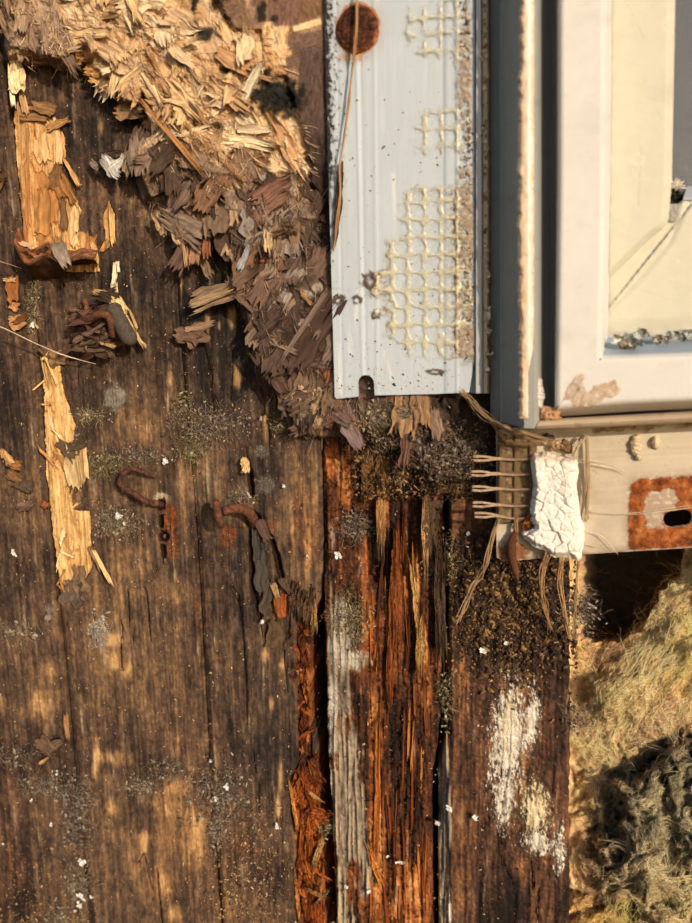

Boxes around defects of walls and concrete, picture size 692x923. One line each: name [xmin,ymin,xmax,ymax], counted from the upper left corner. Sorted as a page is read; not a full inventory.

rust [335,2,380,60]
spalling [0,0,501,923]
rust [628,476,692,550]
damp [329,681,338,748]
damp [485,673,566,876]